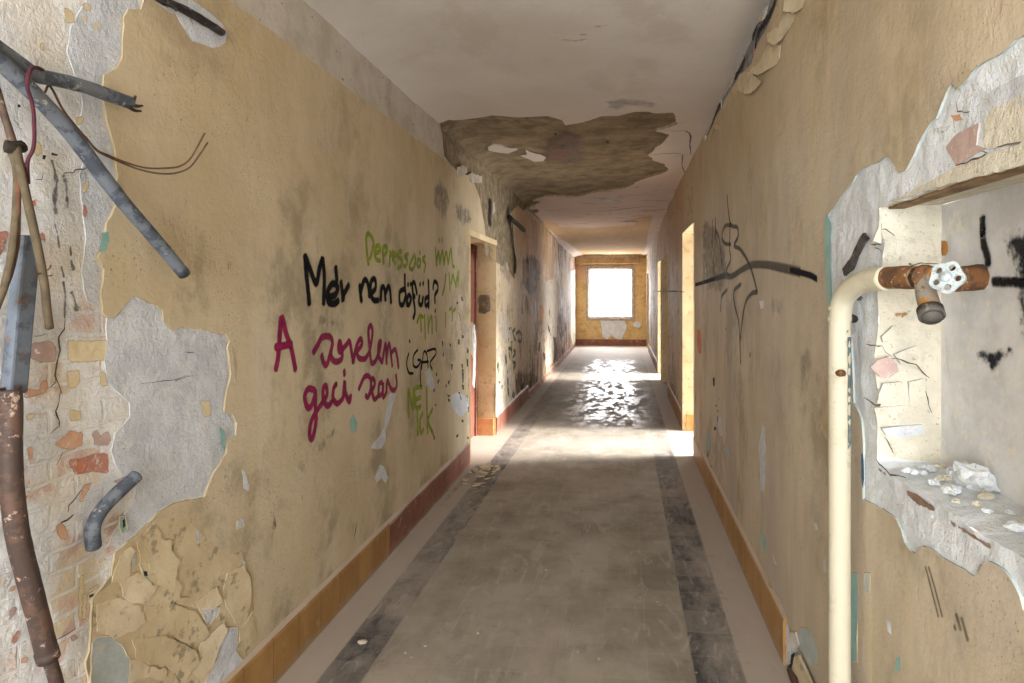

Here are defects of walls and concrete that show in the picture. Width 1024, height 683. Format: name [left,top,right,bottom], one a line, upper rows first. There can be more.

flaking render [0,0,144,181]
flaking render [157,0,227,48]
peeling [705,0,805,142]
flaking render [824,35,1024,314]
flaking render [0,74,258,683]
crack [867,344,932,413]
flaking render [851,291,1024,611]